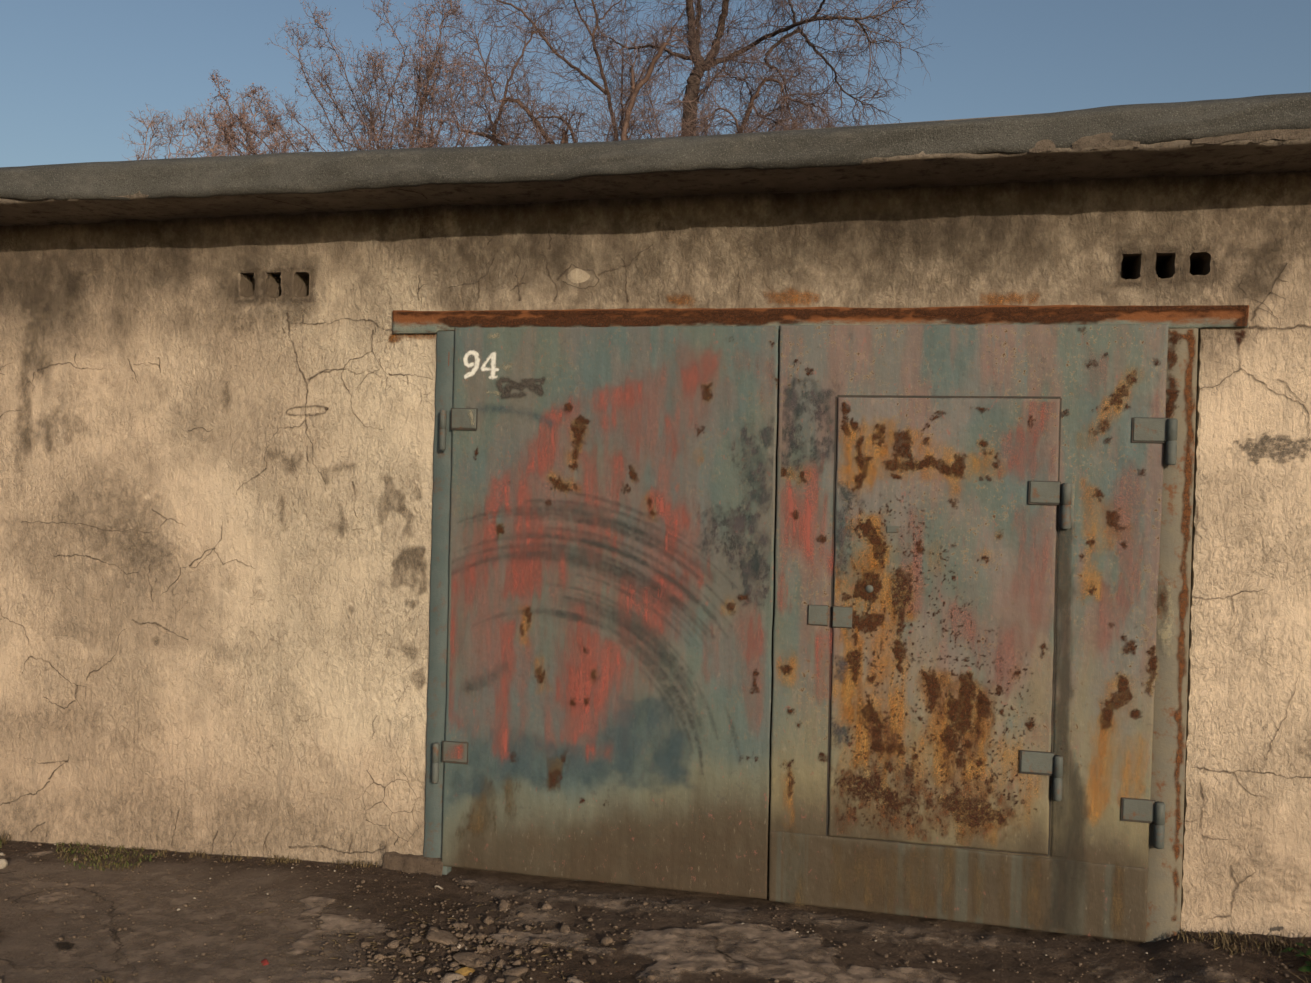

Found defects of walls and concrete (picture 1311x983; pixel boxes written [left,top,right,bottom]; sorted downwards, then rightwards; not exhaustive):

crack [236,313,427,494]
rust [545,403,591,505]
rust [390,290,1248,343]
rust [841,402,999,507]
crack [1202,264,1311,438]
spalling [1234,435,1308,463]
rust [1080,490,1127,599]
crack [0,509,255,709]
rust [836,500,1037,841]
rust [1101,623,1158,747]
rust [1155,329,1195,900]
crack [1,761,68,835]